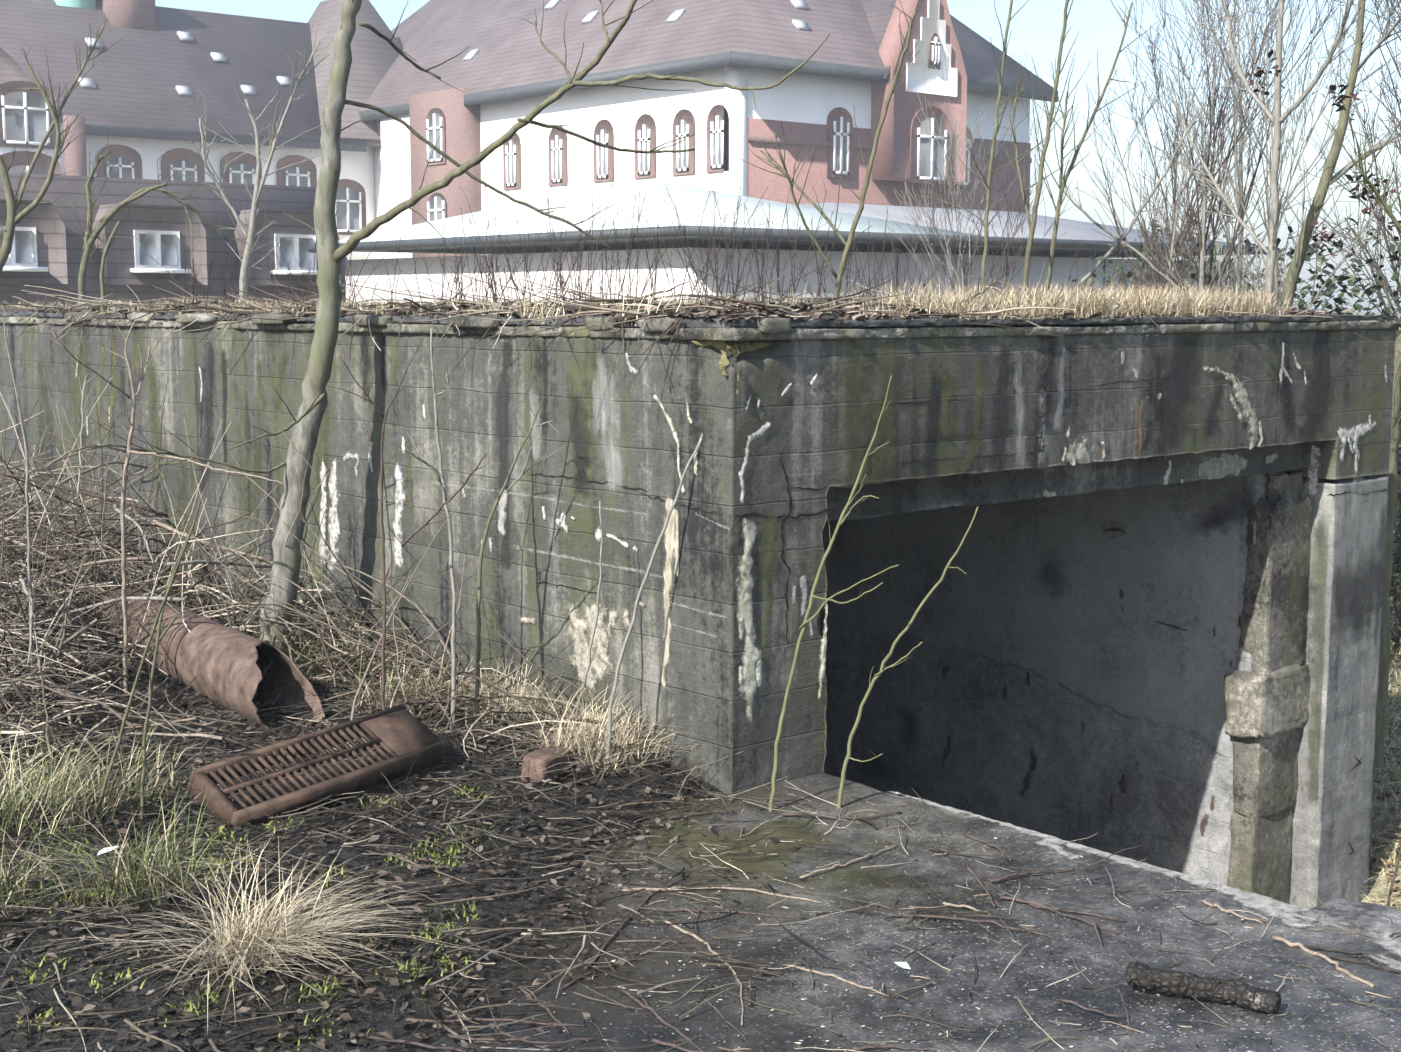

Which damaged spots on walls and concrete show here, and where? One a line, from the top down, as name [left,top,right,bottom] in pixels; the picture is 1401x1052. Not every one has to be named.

water stain [199,343,226,491]
water stain [1155,335,1196,485]
spalling [1197,367,1278,480]
peeling [1340,416,1371,473]
crack [528,395,836,647]
spalling [567,602,645,693]
spalling [1364,936,1401,970]